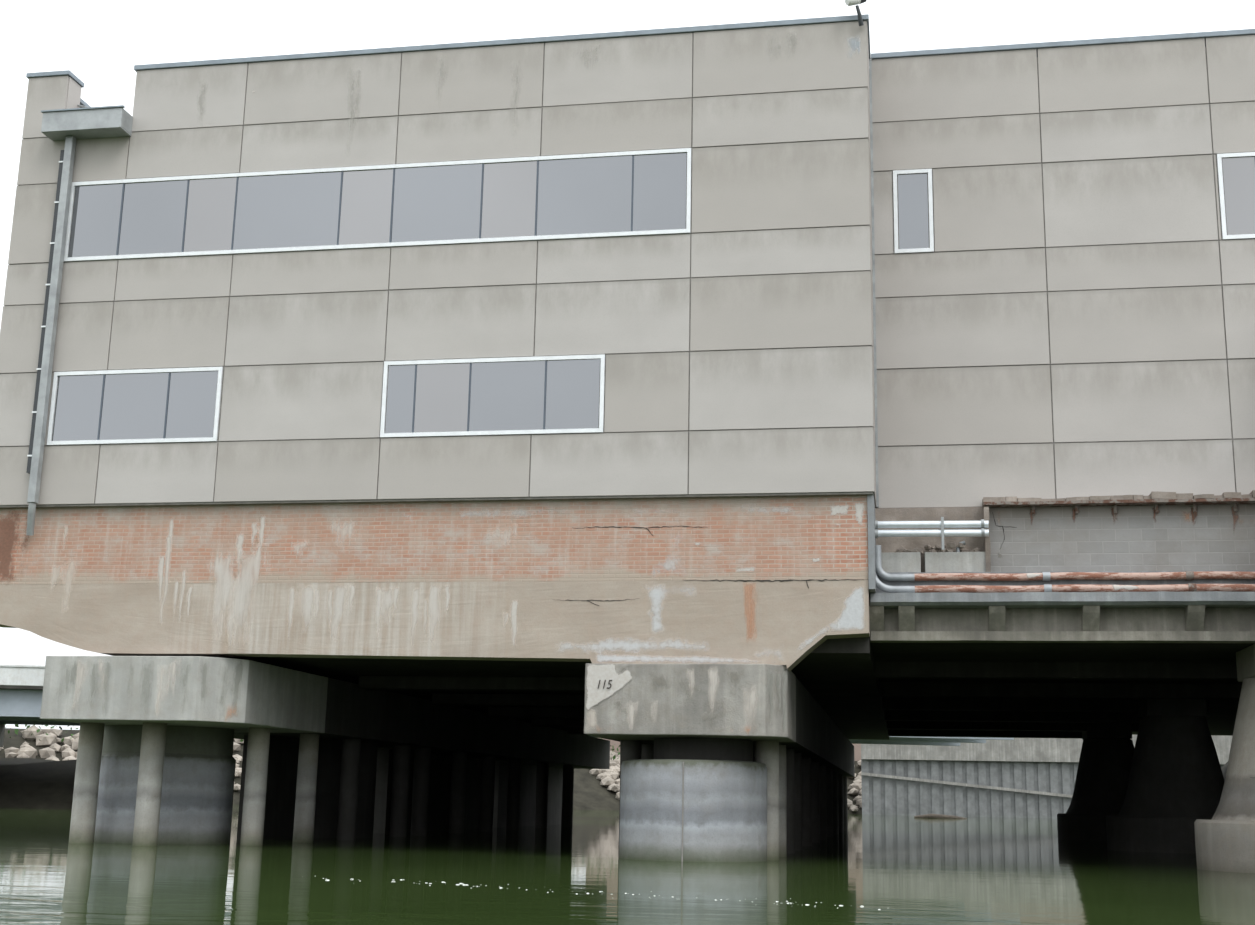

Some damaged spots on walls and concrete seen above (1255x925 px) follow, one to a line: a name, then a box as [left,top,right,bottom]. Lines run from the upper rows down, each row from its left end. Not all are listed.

crack [588,526,702,534]
leakage [158,520,192,619]
leakage [211,517,265,641]
crack [562,598,640,606]
rust [744,584,756,638]